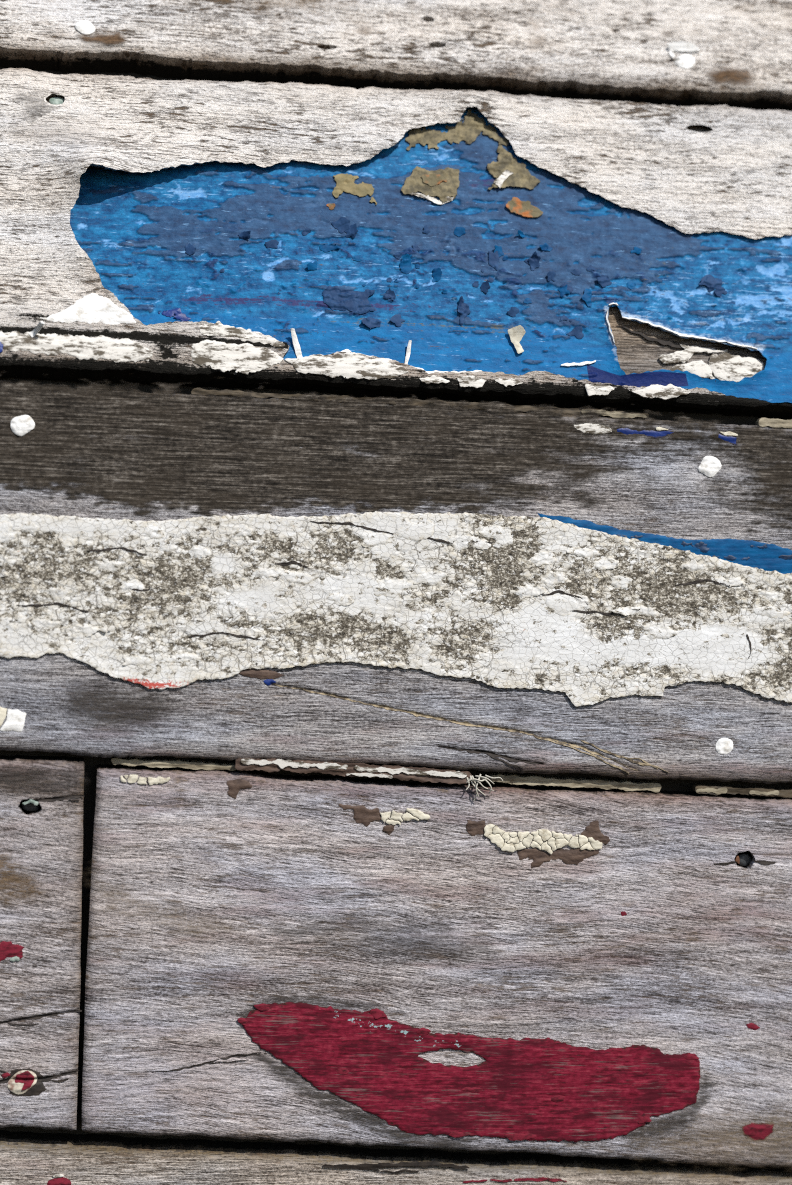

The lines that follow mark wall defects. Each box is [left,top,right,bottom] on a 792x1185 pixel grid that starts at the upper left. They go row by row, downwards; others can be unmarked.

peeling [0,107,792,403]
peeling [0,511,792,706]
peeling [380,808,430,825]
peeling [484,824,603,854]
peeling [0,941,24,962]
crack [0,1010,82,1026]
crack [0,1070,79,1083]
peeling [237,1002,701,1142]